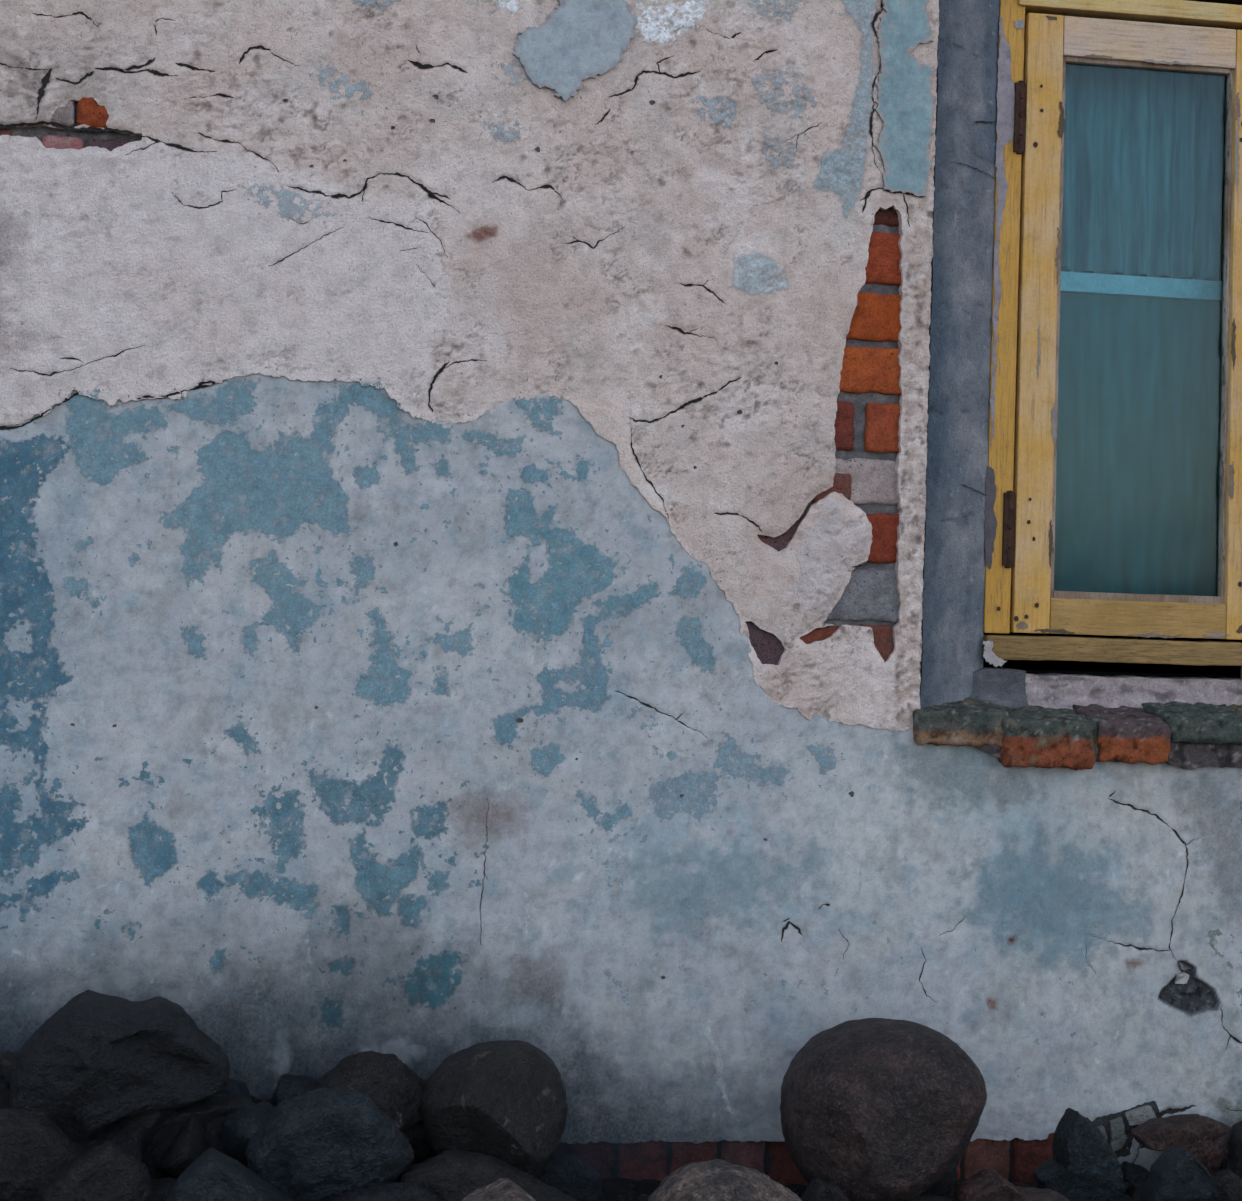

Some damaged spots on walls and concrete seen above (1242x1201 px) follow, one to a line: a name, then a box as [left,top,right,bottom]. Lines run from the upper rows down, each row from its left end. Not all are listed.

flaking render [0,97,142,151]
crack [0,18,467,287]
peeling [478,0,708,102]
crack [595,55,699,125]
crack [860,1,923,227]
crack [0,345,145,430]
crack [428,359,487,412]
flaking render [692,0,937,662]
peeling [0,367,795,937]
peeling [118,732,469,1012]
crack [1085,791,1194,973]
flaking render [1159,962,1217,1013]